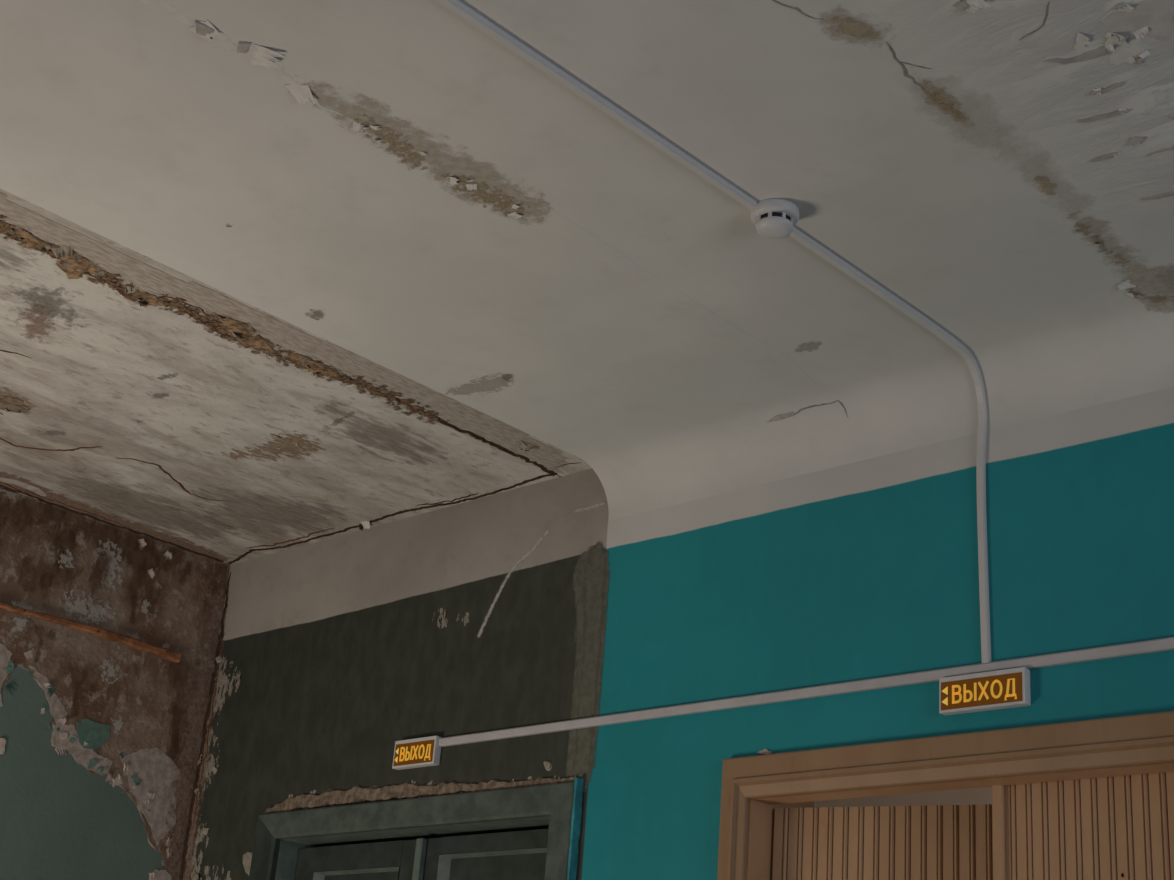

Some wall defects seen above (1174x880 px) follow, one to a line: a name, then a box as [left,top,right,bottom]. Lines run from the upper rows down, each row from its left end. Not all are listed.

crack [773,0,824,20]
water stain [822,9,881,42]
crack [952,0,990,13]
peeling [1043,0,1174,66]
crack [886,42,931,96]
water stain [309,85,549,222]
water stain [1069,215,1174,312]
water stain [63,478,343,540]
crack [0,215,576,880]
peeling [0,487,241,880]
flaking render [262,761,576,814]
peeling [243,851,253,875]